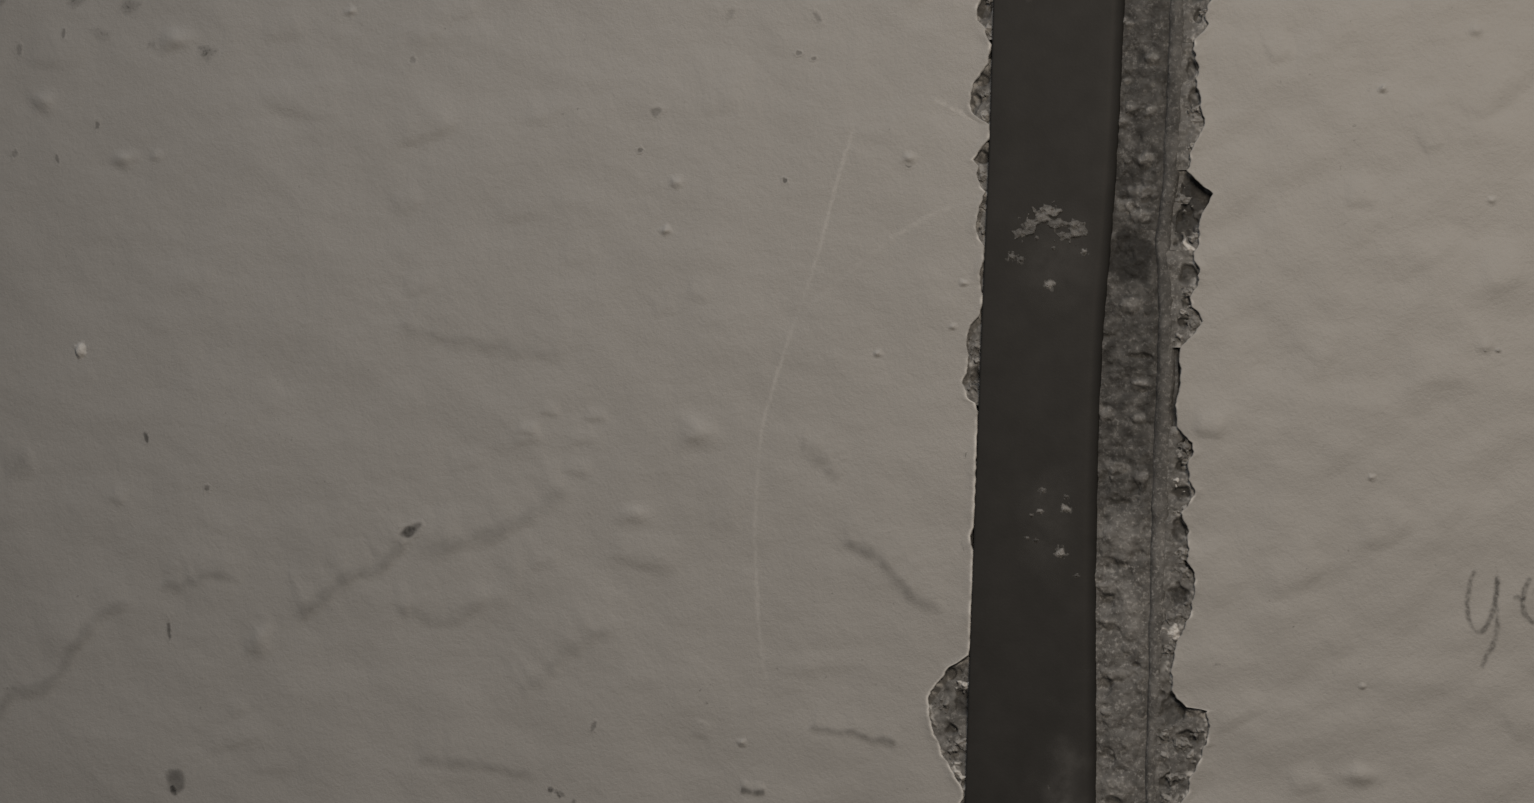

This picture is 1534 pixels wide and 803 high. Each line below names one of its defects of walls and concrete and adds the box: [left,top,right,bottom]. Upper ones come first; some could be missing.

spalling [963,143,989,405]
spalling [970,59,992,125]
spalling [977,0,993,40]
spalling [1166,0,1213,348]
spalling [928,651,970,803]
spalling [1154,427,1210,803]